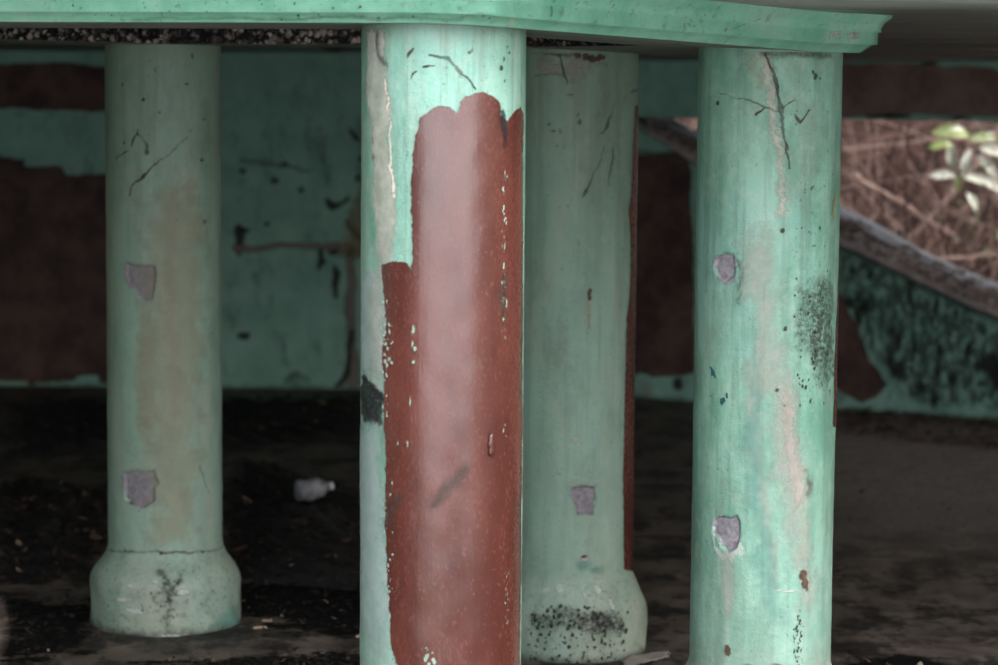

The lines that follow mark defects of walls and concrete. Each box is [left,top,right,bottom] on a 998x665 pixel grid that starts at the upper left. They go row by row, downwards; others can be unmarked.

crack [120,131,183,196]
crack [745,52,810,233]
spalling [713,254,738,285]
peeling [380,297,393,380]
leakage [783,247,998,504]
spalling [122,471,157,509]
spalling [570,486,595,516]
spalling [712,514,744,563]
leakage [527,579,629,664]